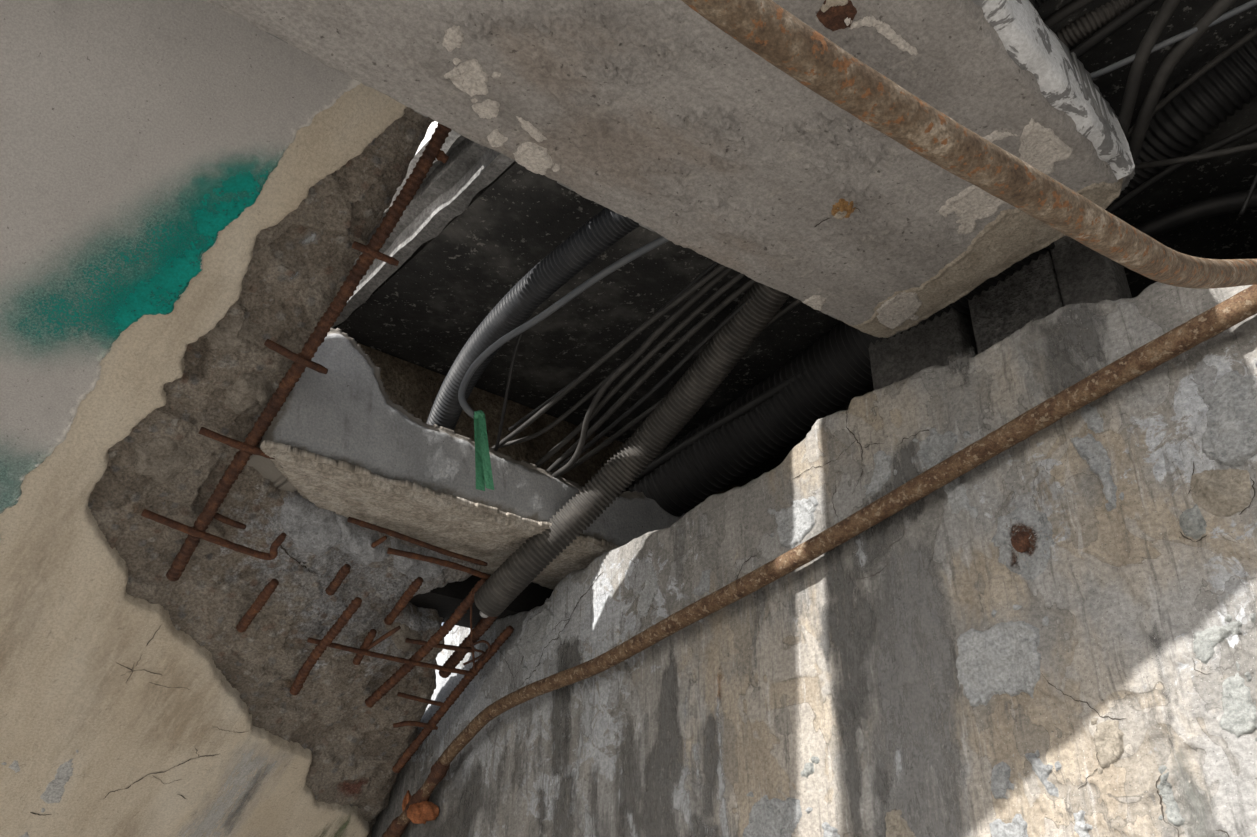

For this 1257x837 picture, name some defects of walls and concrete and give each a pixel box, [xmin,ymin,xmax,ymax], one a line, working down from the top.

peeling [442,25,560,175]
peeling [983,118,1073,175]
peeling [1077,177,1124,209]
peeling [836,185,1065,338]
spalling [141,123,514,773]
rust [991,508,1055,582]
crack [116,624,188,689]
peeling [956,604,1049,707]
crack [105,728,247,799]
rust [382,758,450,837]
damp [538,640,598,837]
damp [616,650,729,837]